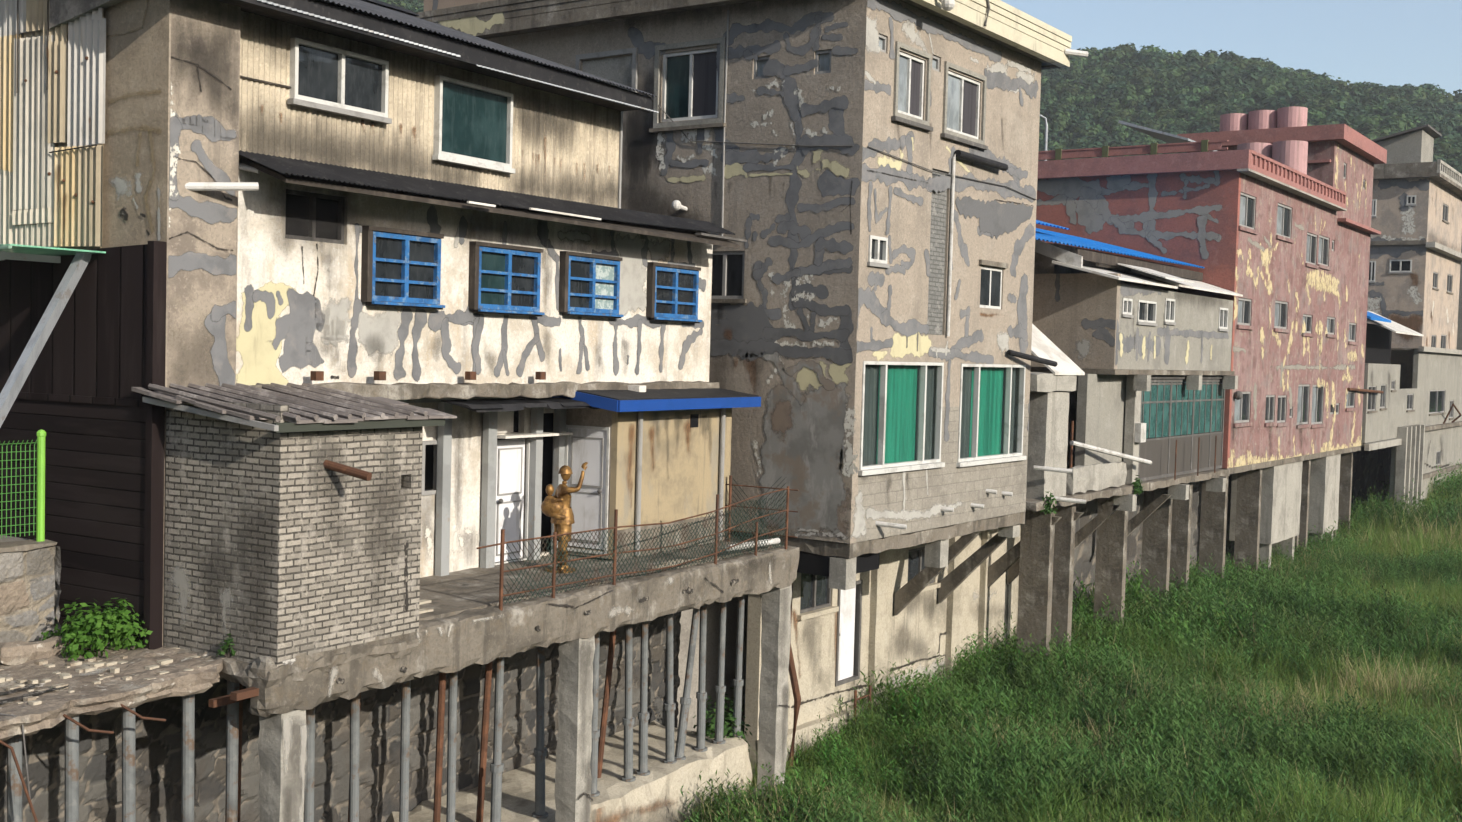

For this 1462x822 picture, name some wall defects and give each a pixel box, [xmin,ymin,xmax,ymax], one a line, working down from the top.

leakage [522,105,574,137]
peeling [749,79,828,177]
peeling [120,143,183,241]
peeling [1227,218,1382,468]